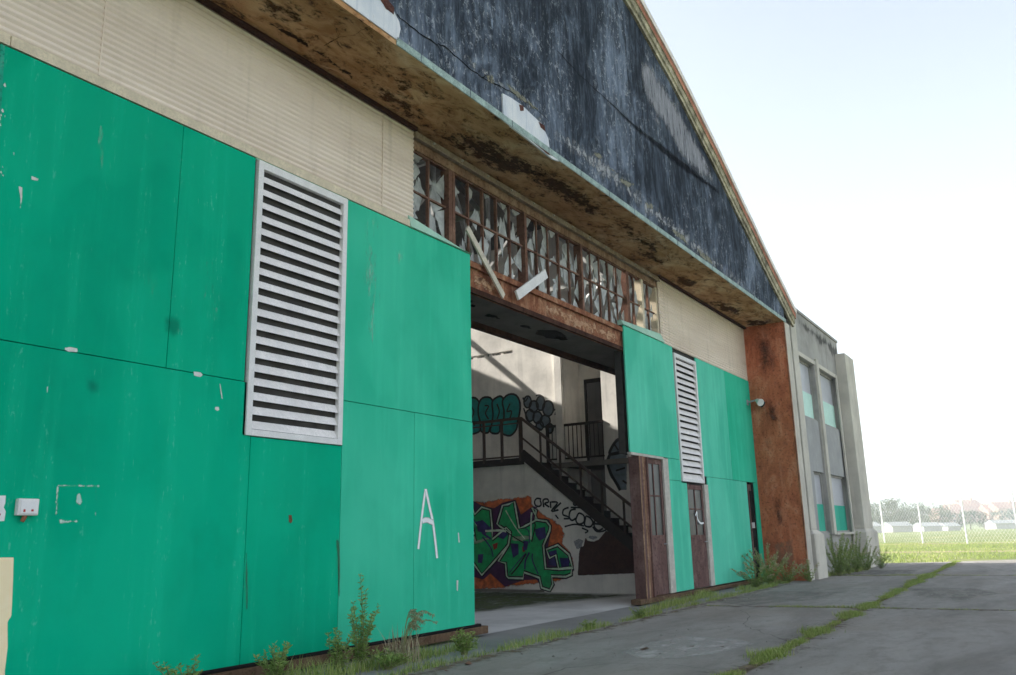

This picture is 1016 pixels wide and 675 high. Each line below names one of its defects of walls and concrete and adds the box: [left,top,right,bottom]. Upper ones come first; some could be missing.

leakage [259,0,352,79]
crack [397,14,548,120]
leakage [372,79,663,264]
leakage [621,114,715,190]
corrosion [546,305,616,342]
leakage [714,301,768,325]
peeling [0,557,14,675]